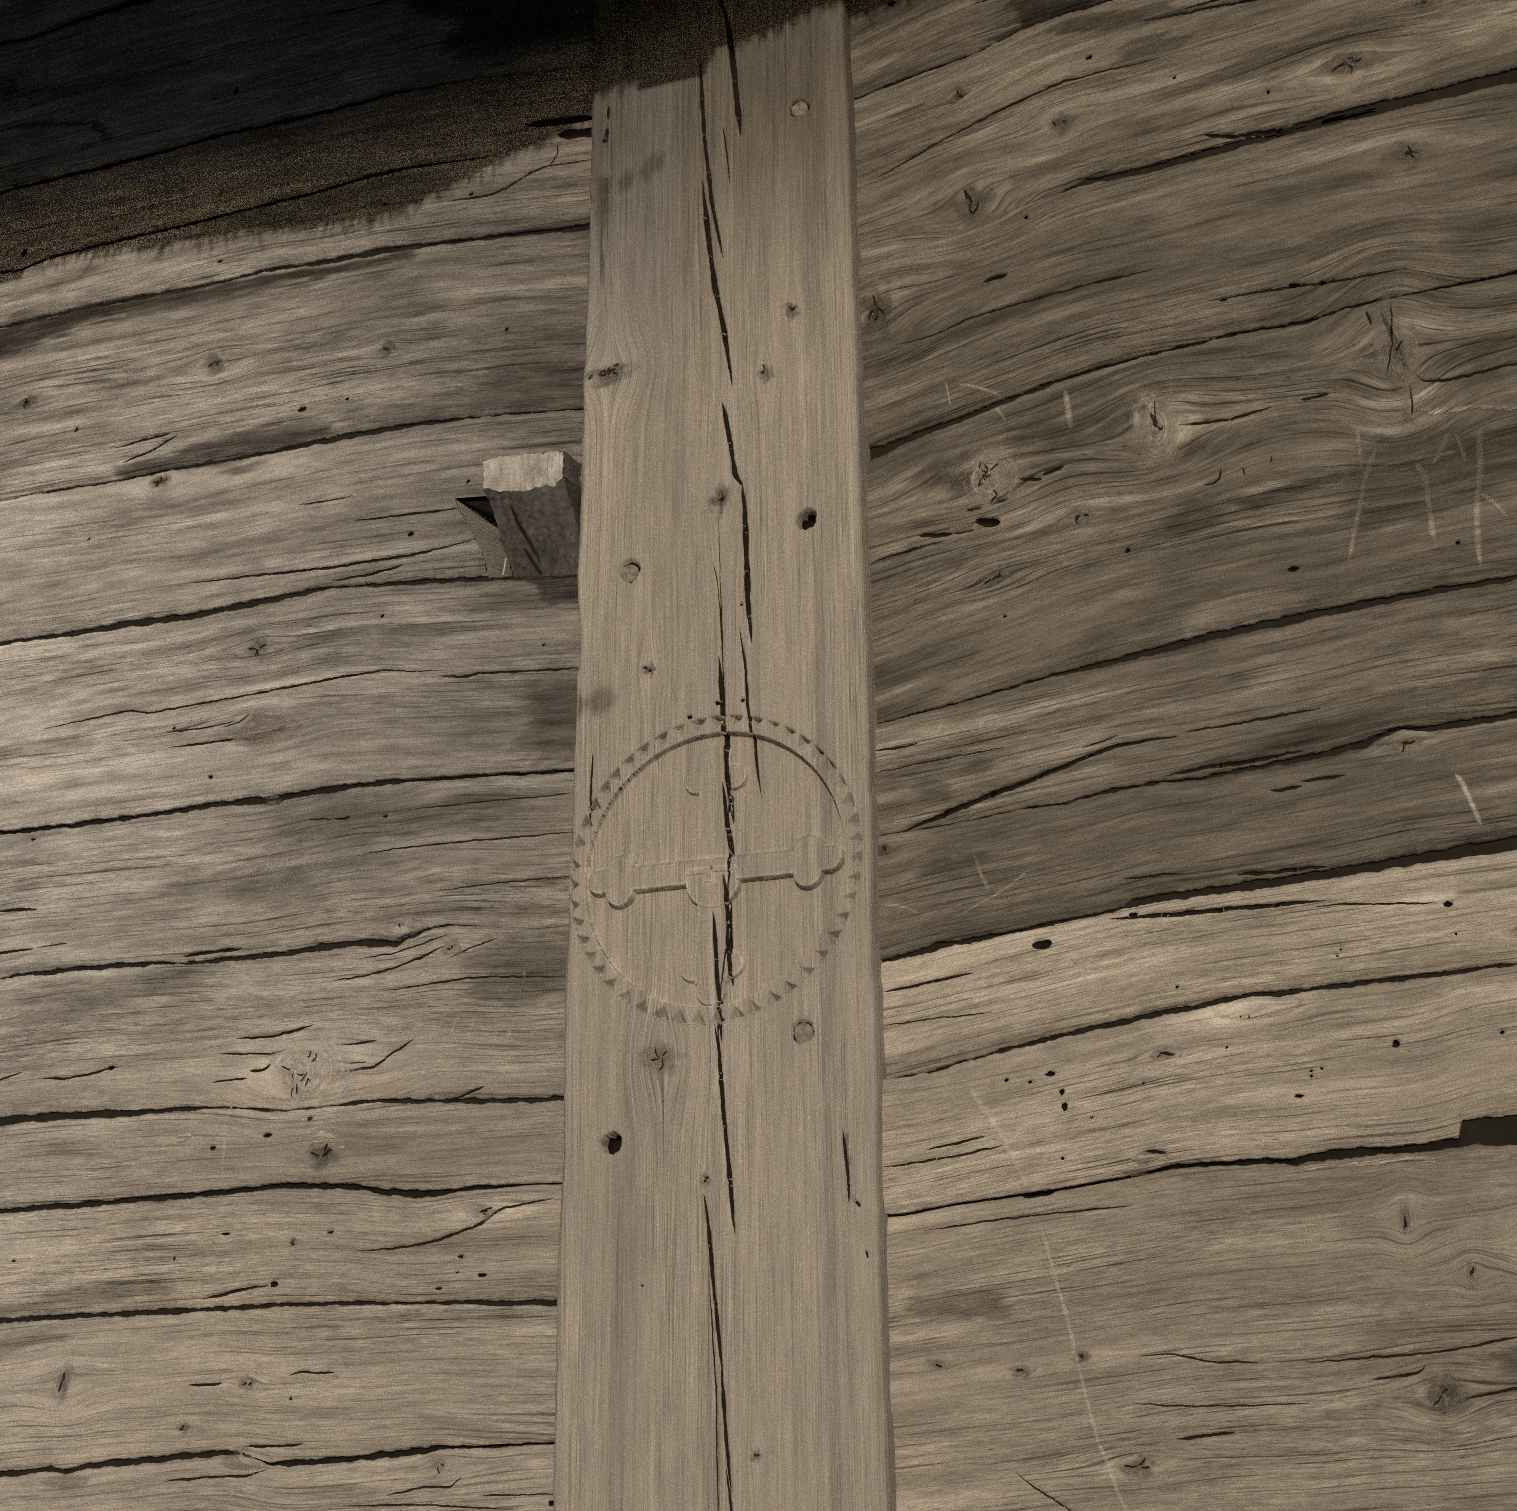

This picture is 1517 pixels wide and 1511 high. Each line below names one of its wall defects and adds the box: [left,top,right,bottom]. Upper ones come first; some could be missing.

crack [700,0,765,1511]
crack [843,1132,1004,1207]
crack [924,1189,1130,1231]